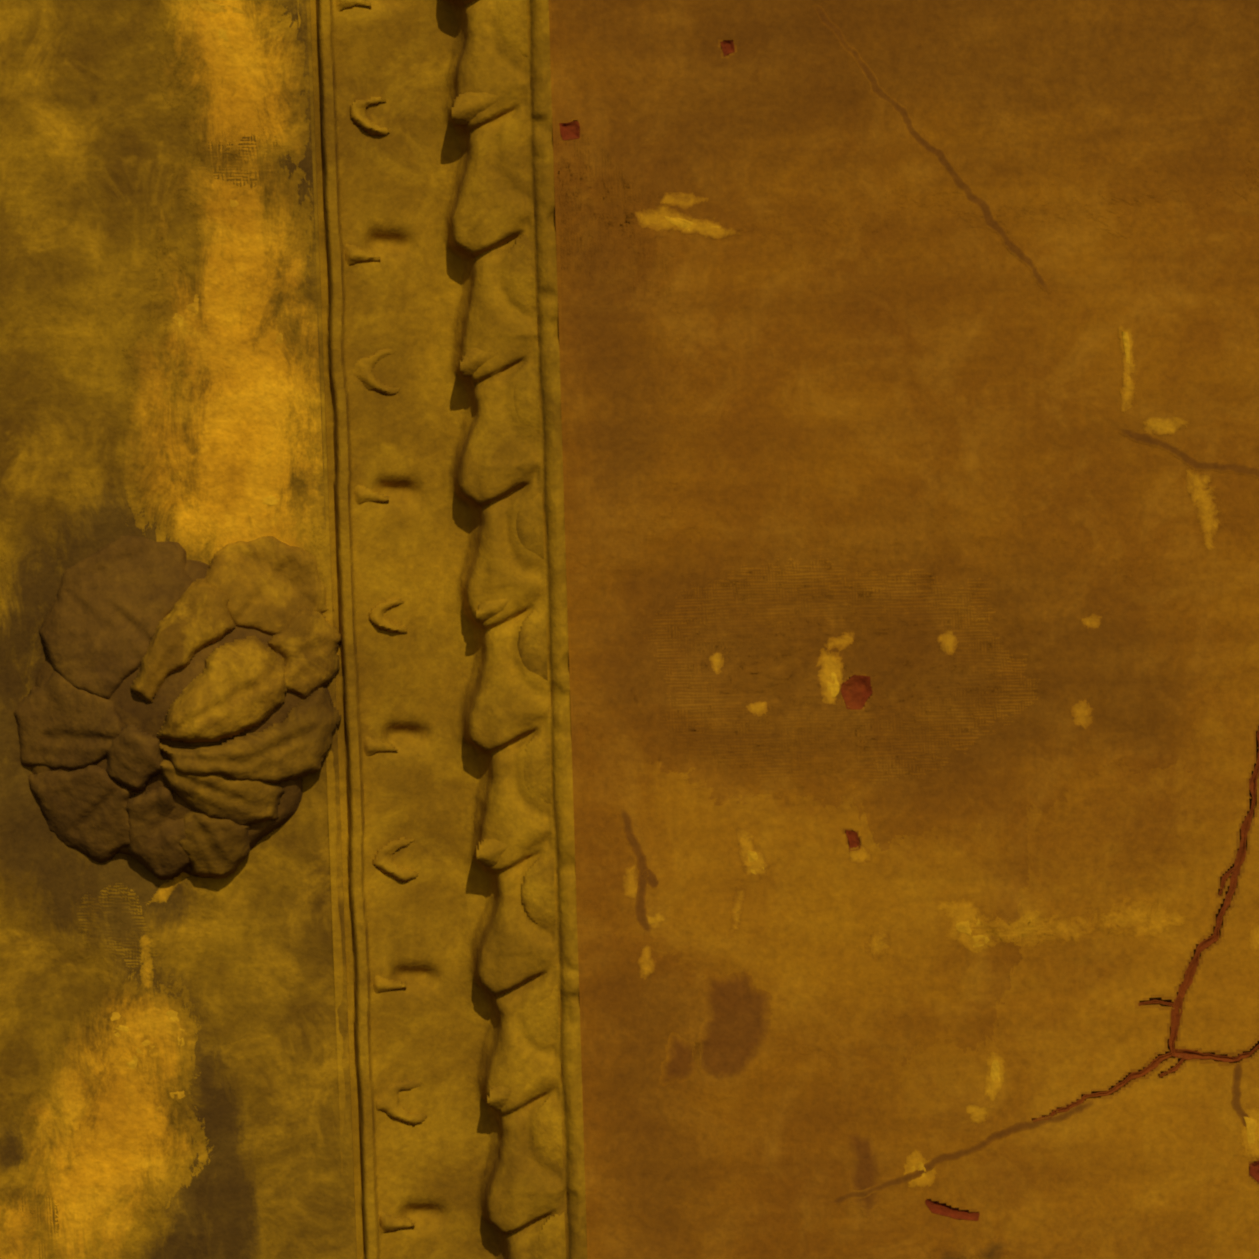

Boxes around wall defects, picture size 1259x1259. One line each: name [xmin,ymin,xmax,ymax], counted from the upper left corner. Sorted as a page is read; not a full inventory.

peeling [634,192,741,240]
crack [1119,428,1259,479]
leakage [552,0,1259,1259]
peeling [816,631,873,710]
crack [823,730,1259,1205]
spalling [1240,1107,1259,1182]